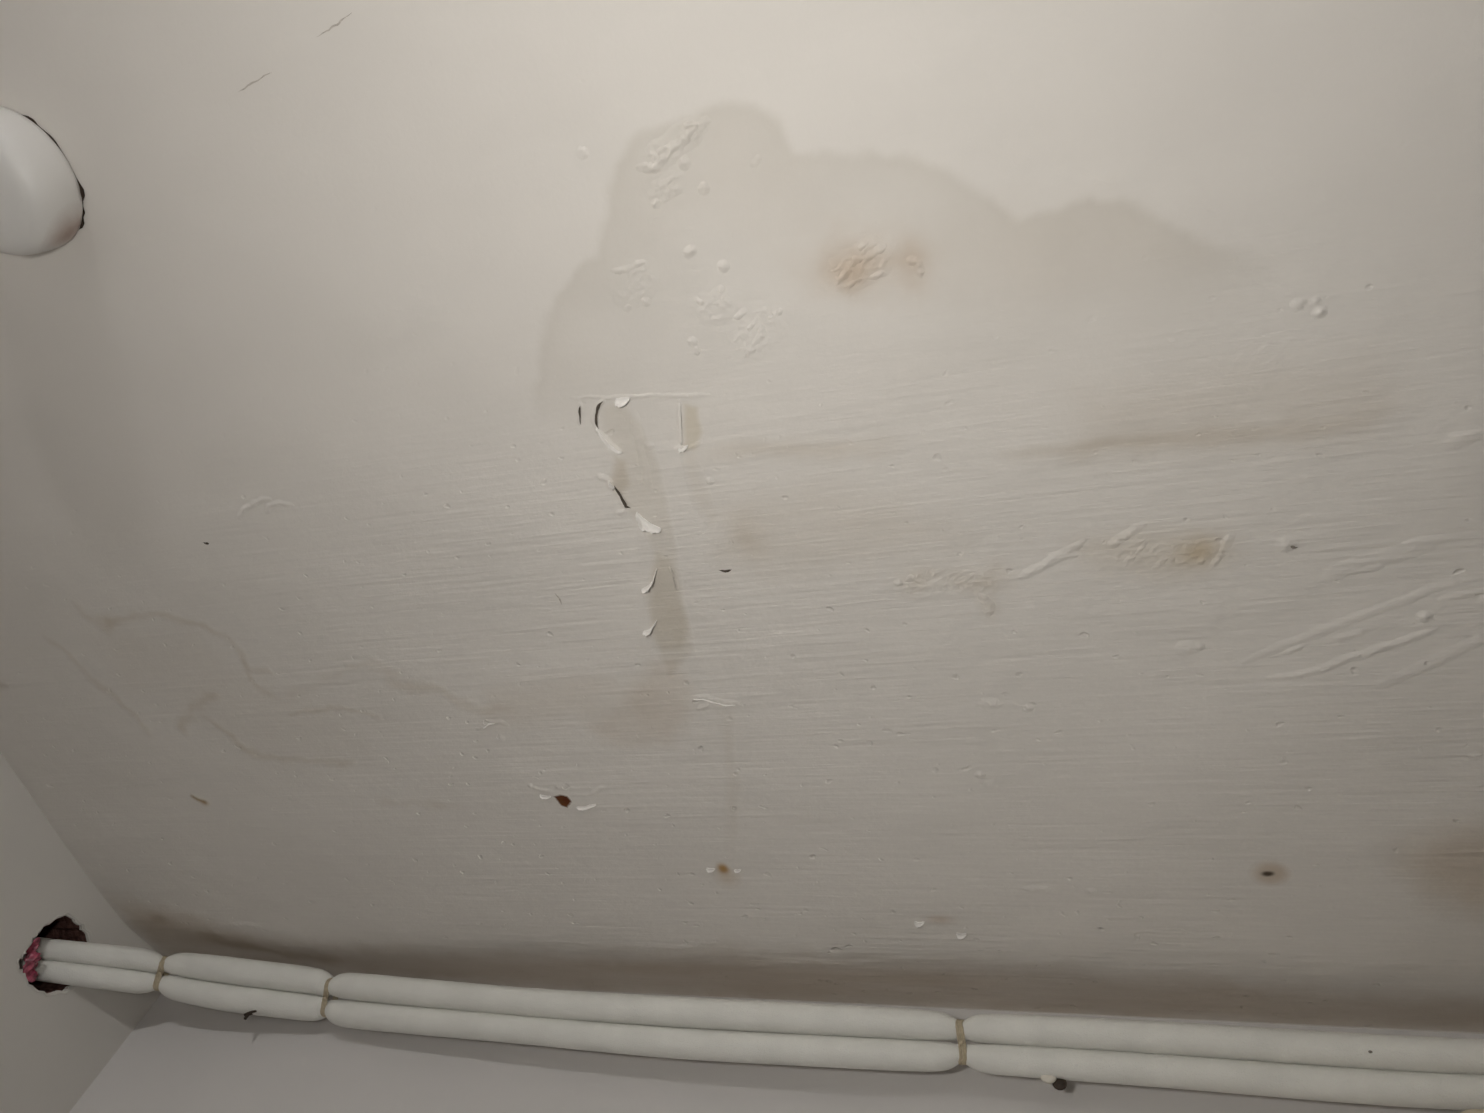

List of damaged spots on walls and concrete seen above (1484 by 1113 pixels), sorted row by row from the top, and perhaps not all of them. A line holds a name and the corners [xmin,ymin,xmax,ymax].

leakage [527,92,1439,591]
peeling [565,392,716,666]
rust [553,793,573,808]
rust [710,861,745,891]
rust [1247,859,1294,888]
leakage [1363,804,1484,929]
leakage [100,886,1484,1033]